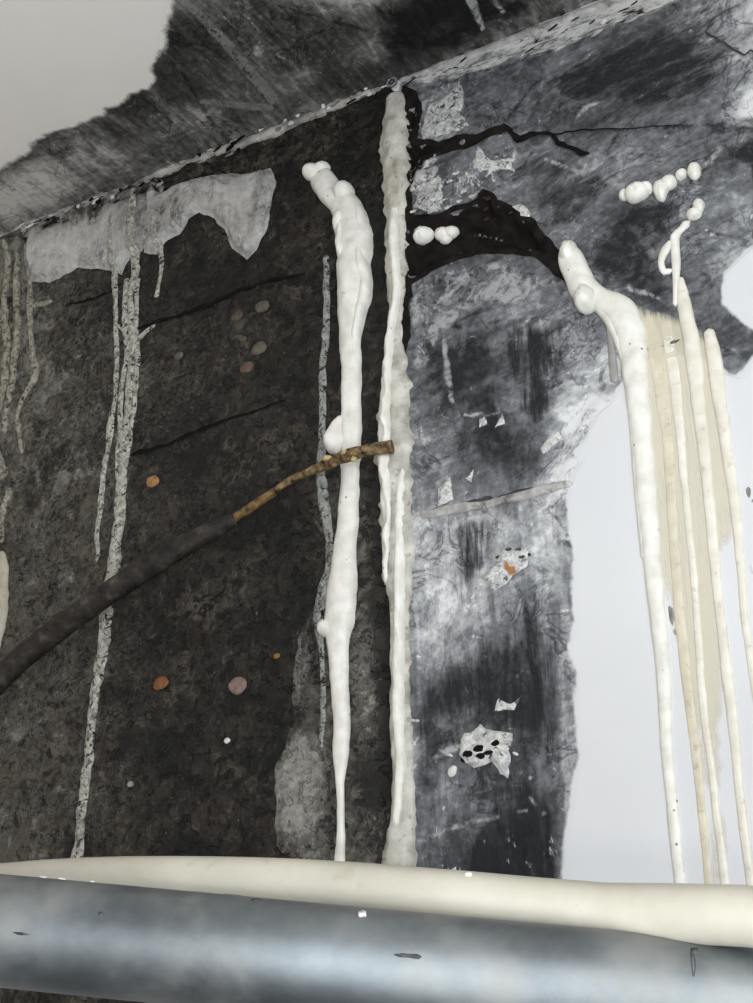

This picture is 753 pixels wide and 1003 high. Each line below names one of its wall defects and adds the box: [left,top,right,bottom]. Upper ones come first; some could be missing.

efflorescence [0,451,12,543]
efflorescence [0,236,53,454]
spalling [0,474,328,863]
spalling [0,0,605,661]
efflorescence [313,255,334,750]
peeling [396,0,753,879]
damp [639,311,730,779]
spalling [0,988,144,1003]